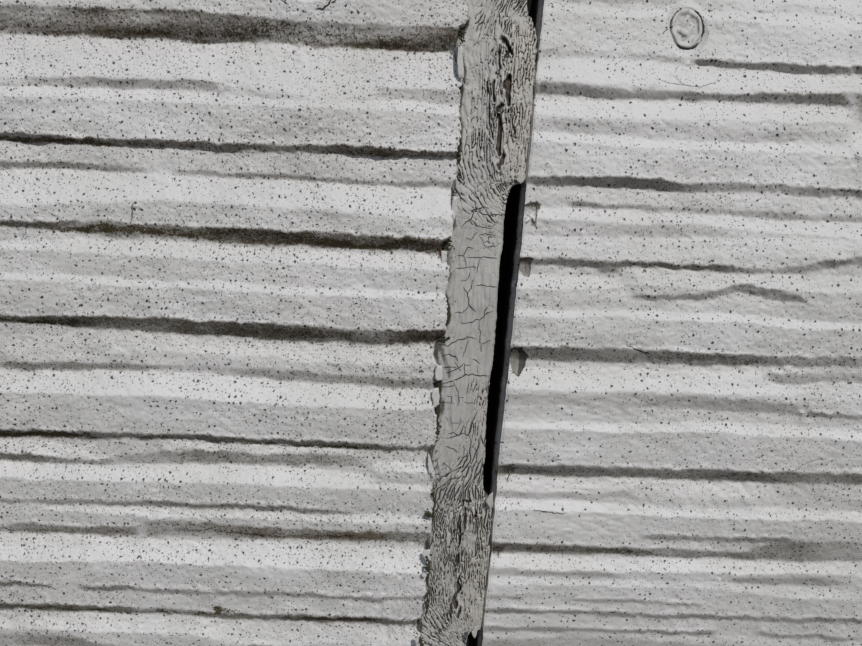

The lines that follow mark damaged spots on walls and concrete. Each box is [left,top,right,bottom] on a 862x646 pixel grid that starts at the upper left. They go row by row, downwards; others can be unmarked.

crack [421,0,537,646]